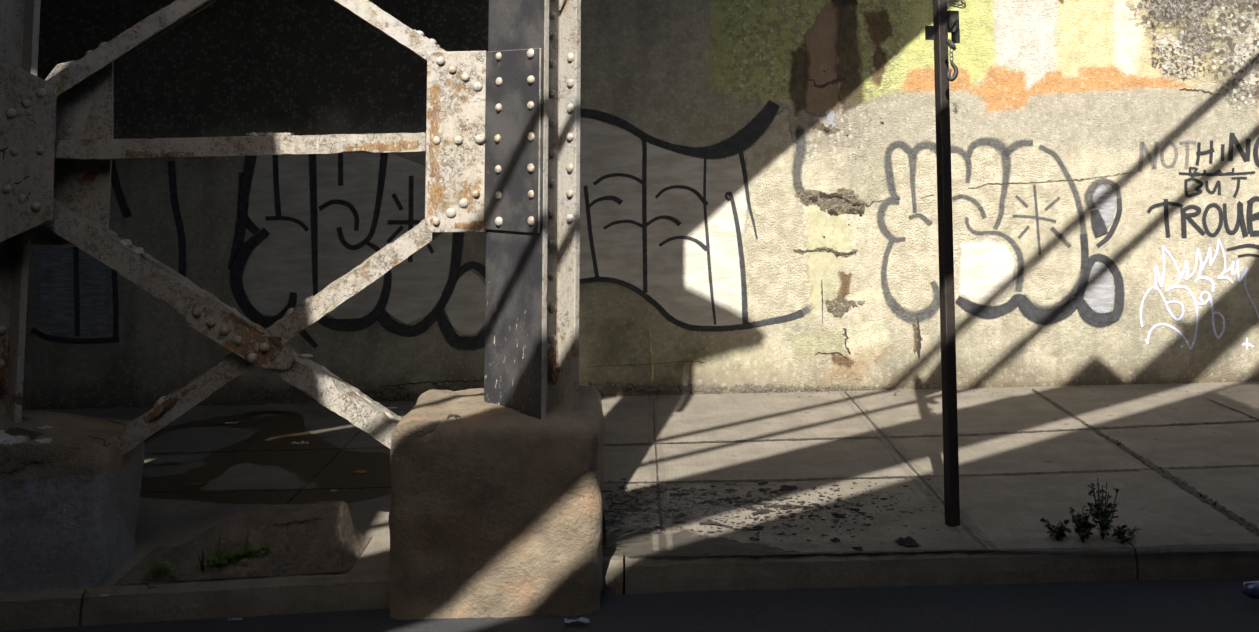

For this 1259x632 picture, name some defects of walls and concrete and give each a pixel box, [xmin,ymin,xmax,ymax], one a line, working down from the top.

corrosion [451,183,486,231]
spalling [795,187,867,215]
corrosion [223,312,283,366]